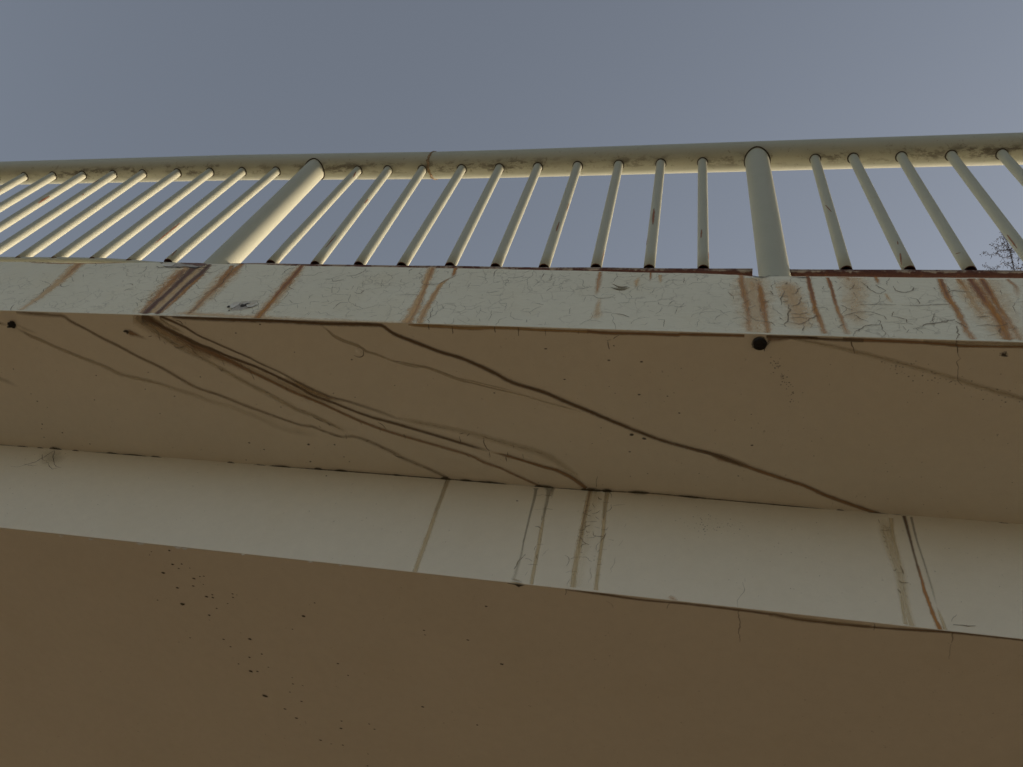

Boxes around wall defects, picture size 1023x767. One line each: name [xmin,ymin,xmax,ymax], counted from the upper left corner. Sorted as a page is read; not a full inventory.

corrosion [142,264,211,314]
corrosion [189,264,244,314]
corrosion [255,265,304,318]
corrosion [402,267,457,323]
corrosion [739,275,769,333]
corrosion [780,276,826,334]
corrosion [825,277,846,330]
crack [712,275,1023,382]
corrosion [938,278,1014,340]
damp [22,312,1023,641]
corrosion [903,516,947,630]